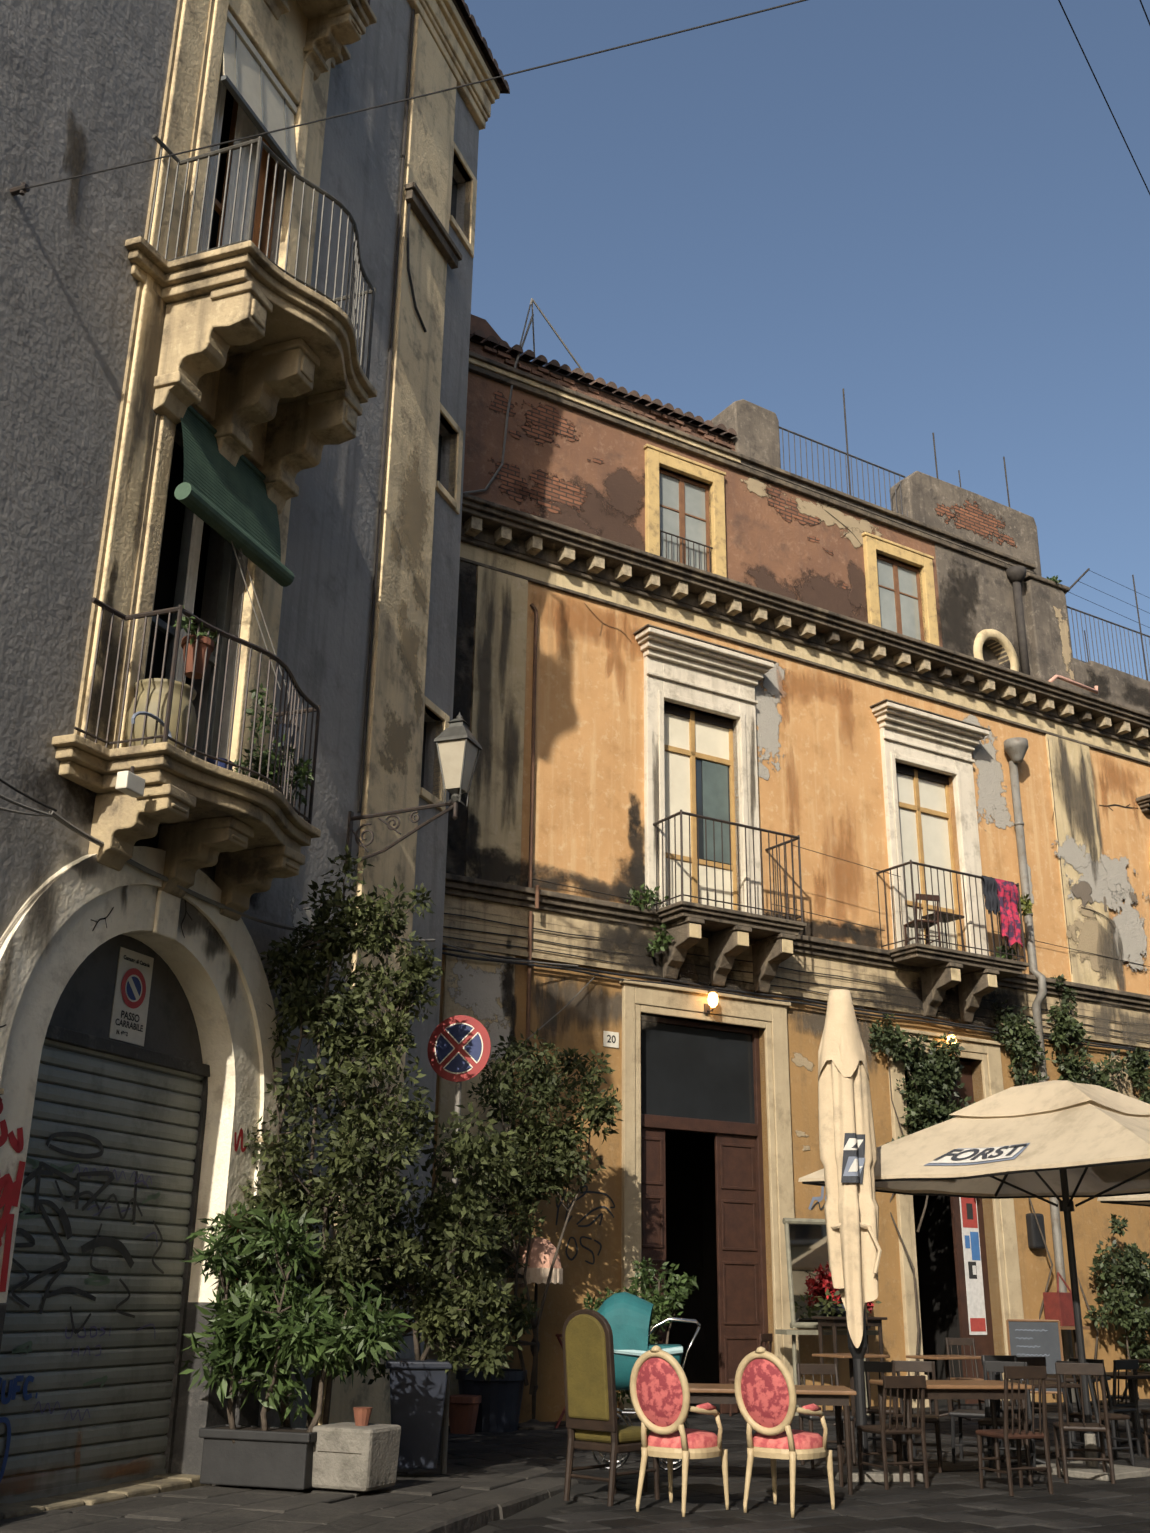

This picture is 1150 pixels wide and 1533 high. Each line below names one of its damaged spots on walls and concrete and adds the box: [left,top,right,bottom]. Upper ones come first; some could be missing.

damp [65,115,86,216]
spalling [489,391,583,447]
spalling [488,457,589,514]
peeling [740,477,884,556]
spalling [935,500,1017,548]
damp [937,561,978,656]
damp [447,573,771,1000]
peeling [755,663,787,780]
peeling [962,714,1014,830]
peeling [1051,835,1150,972]